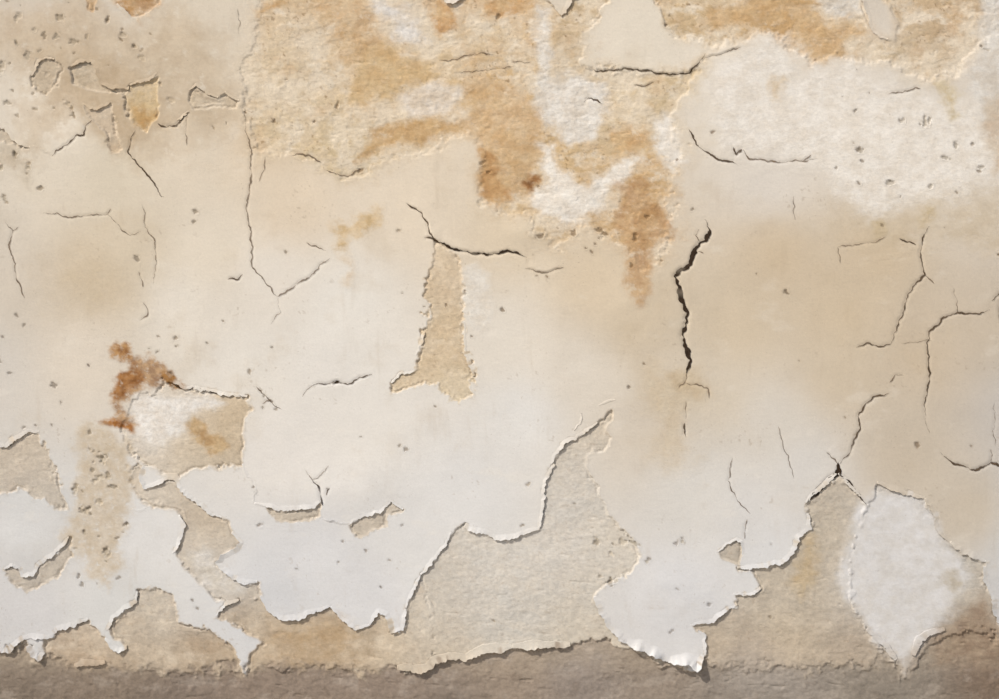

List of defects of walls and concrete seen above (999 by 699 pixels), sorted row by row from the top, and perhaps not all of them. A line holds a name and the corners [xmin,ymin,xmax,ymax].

peeling [188,0,467,186]
water stain [394,73,465,118]
peeling [408,0,697,218]
water stain [526,0,640,234]
water stain [696,0,999,266]
corrosion [105,338,188,436]
peeling [389,237,480,409]
crack [408,204,563,274]
peeling [0,370,999,699]
crack [674,221,711,436]
crack [778,375,895,504]
crack [838,228,999,429]